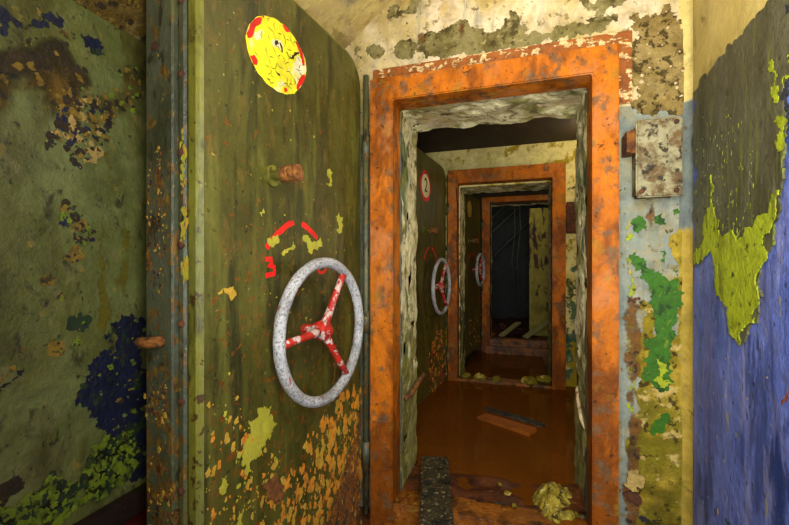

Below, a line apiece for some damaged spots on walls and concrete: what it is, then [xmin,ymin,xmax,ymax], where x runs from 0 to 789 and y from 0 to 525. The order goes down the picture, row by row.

peeling [0,5,65,36]
damp [0,29,145,116]
peeling [81,34,105,56]
spalling [354,0,626,60]
peeling [45,94,116,169]
peeling [625,0,789,346]
corrosion [145,146,166,302]
peeling [0,311,147,525]
peeling [205,385,363,525]
peeling [428,329,446,392]
peeling [625,229,684,525]